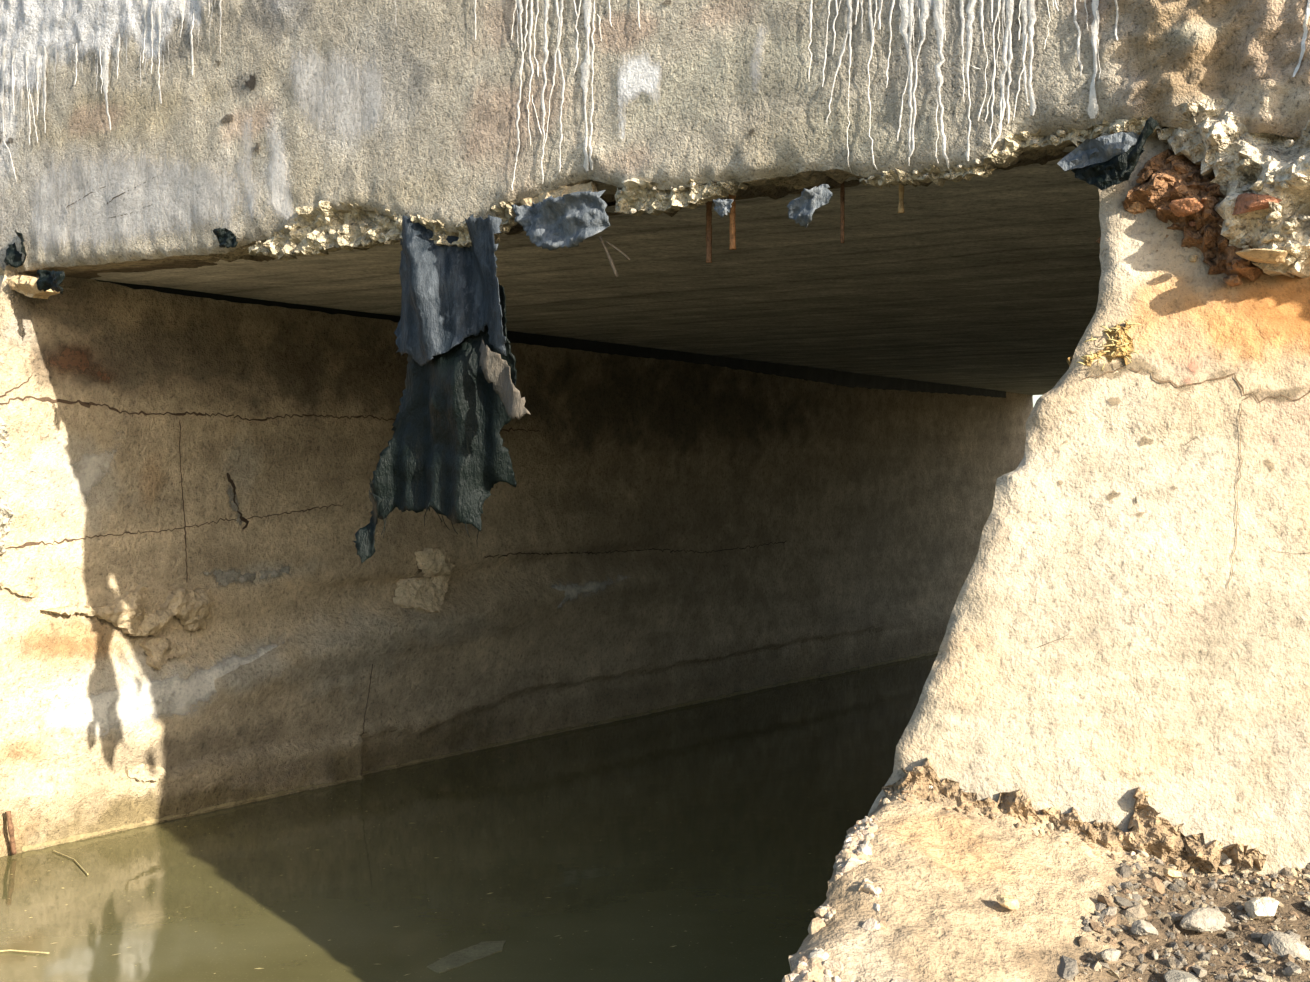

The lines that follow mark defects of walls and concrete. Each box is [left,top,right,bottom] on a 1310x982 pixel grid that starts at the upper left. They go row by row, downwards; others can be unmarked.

efflorescence [0,0,222,182]
efflorescence [511,0,618,190]
efflorescence [808,0,1119,173]
efflorescence [269,131,293,219]
spalling [244,200,472,261]
spalling [489,181,598,243]
spalling [614,179,749,263]
spalling [840,116,1164,243]
crack [0,375,396,582]
crack [485,541,786,558]
peeling [0,581,214,671]
spalling [881,757,1267,874]